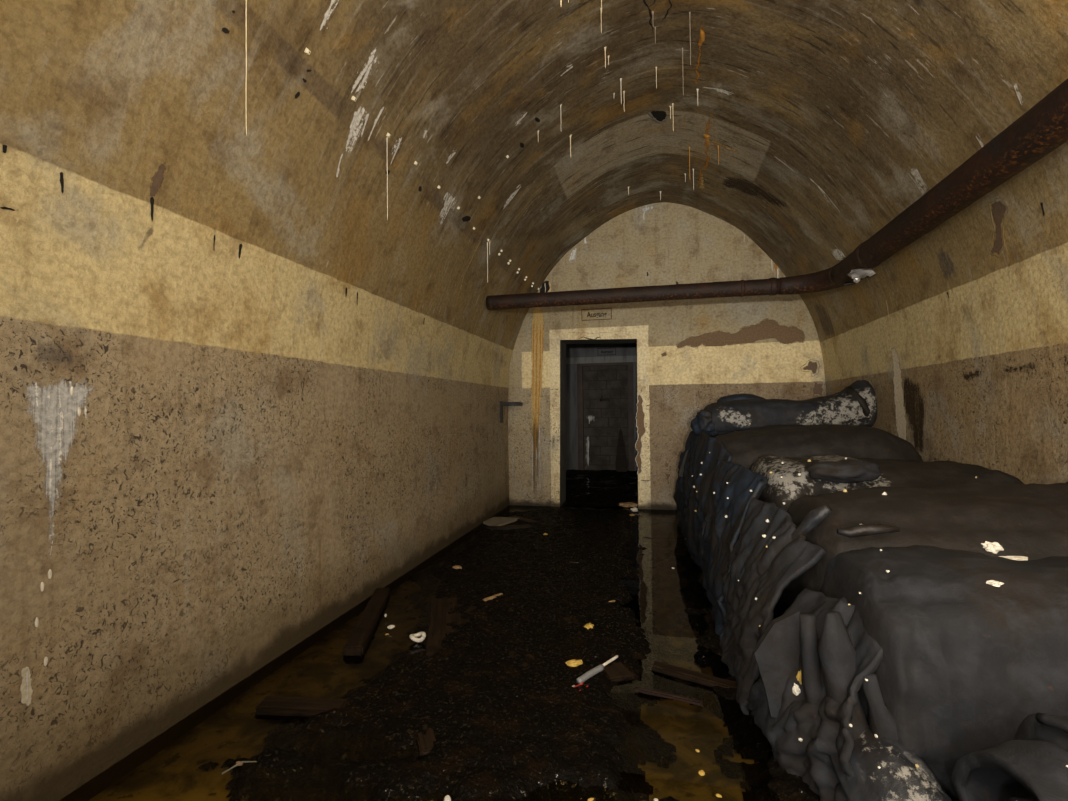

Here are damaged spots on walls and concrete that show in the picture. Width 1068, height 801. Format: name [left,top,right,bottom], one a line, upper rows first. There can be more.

damp [27,381,92,554]
damp [20,666,33,706]